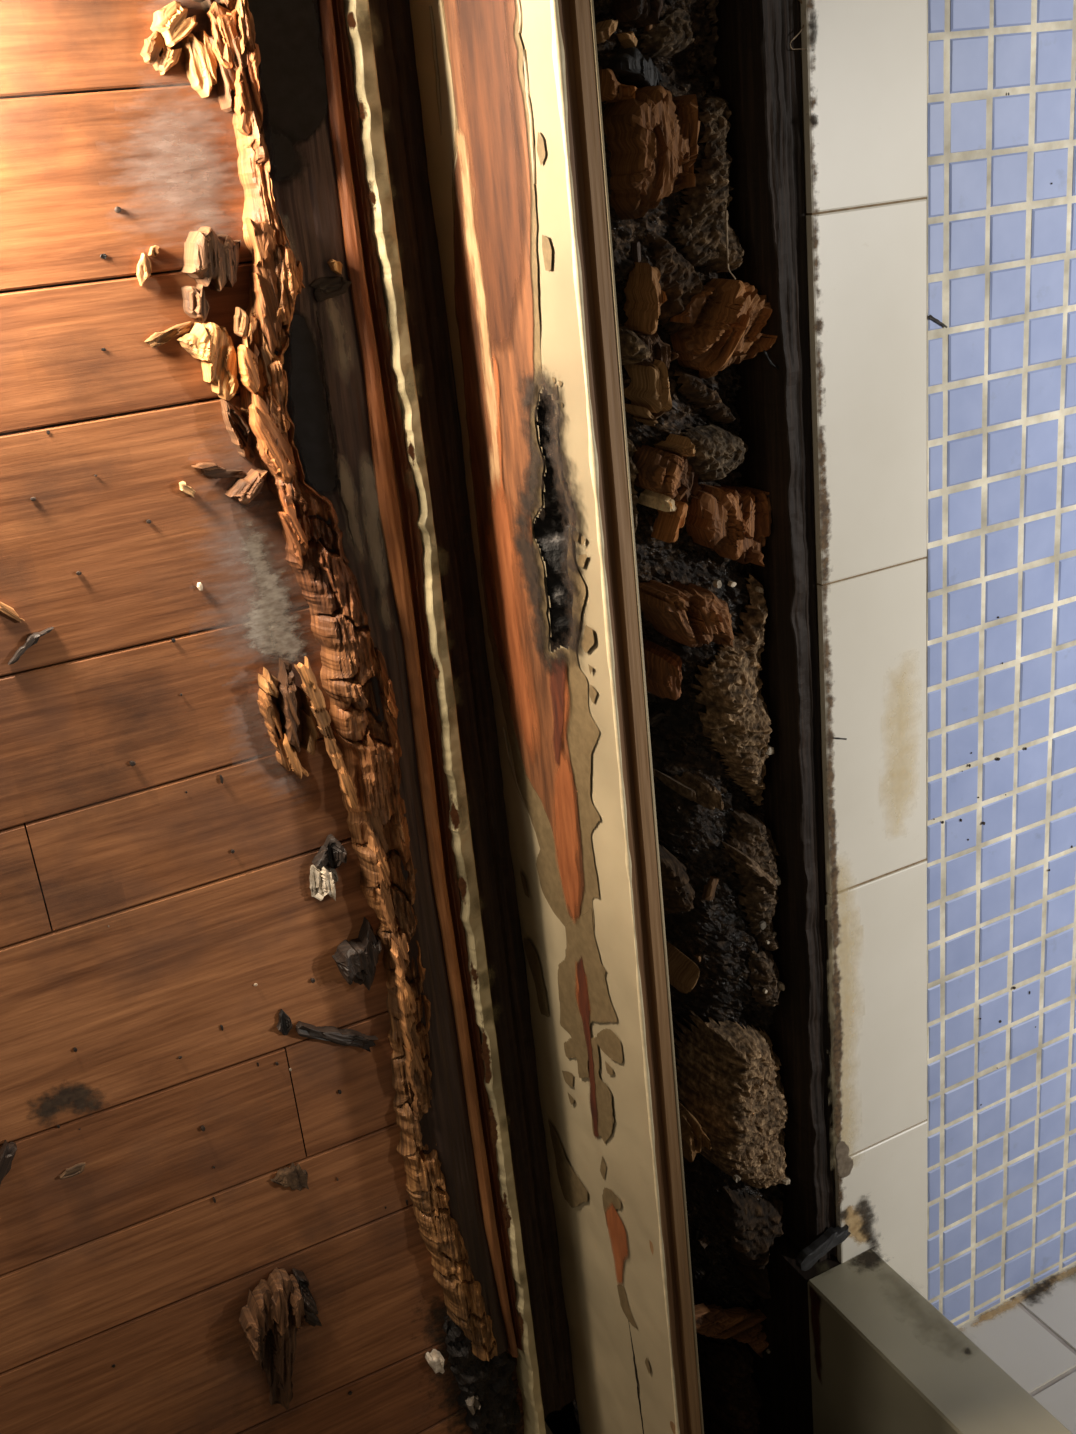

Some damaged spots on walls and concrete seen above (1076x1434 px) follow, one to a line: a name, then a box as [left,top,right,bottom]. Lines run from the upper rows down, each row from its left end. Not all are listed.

peeling [429,0,638,1330]
peeling [312,834,347,869]
peeling [332,917,382,990]
peeling [276,1009,292,1036]
leakage [1025,1276,1056,1303]
leakage [418,1297,472,1433]